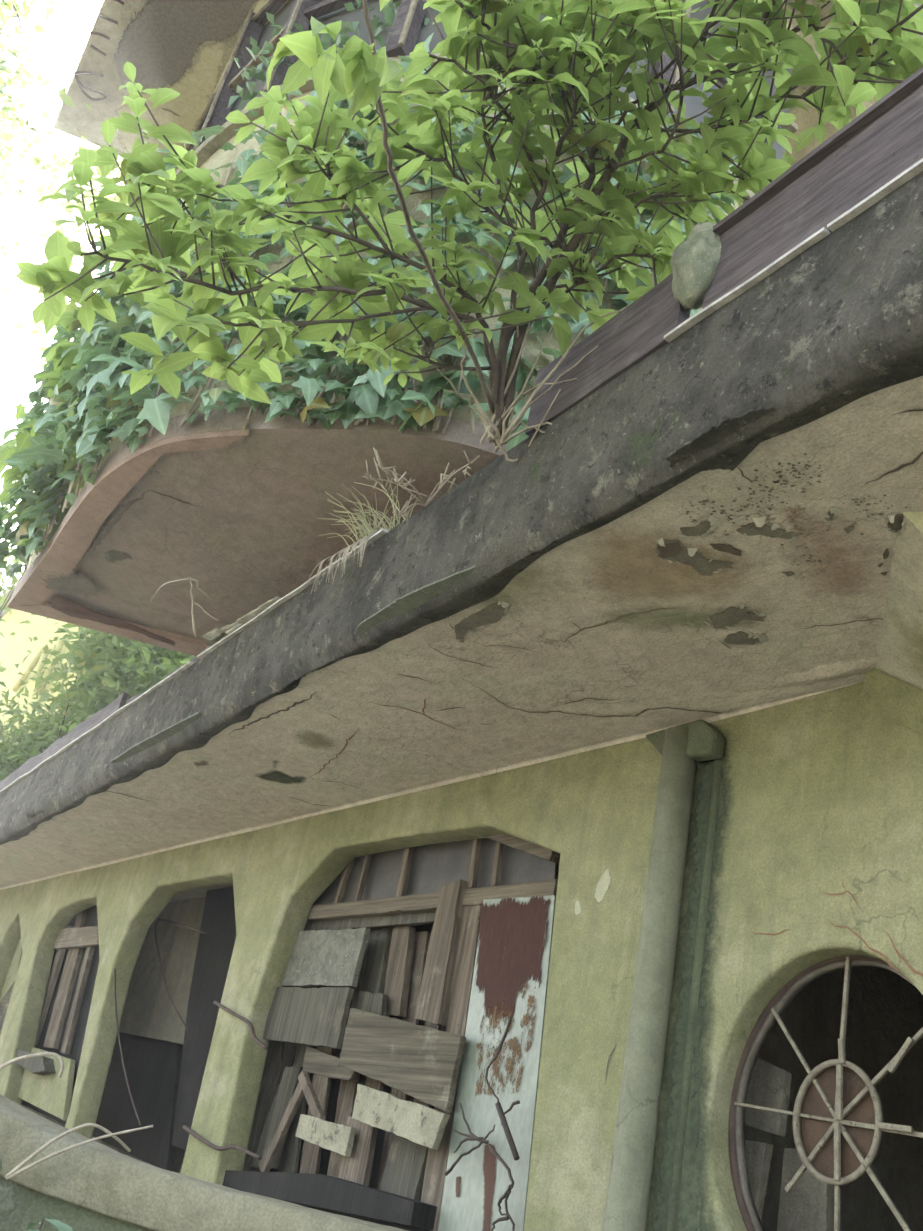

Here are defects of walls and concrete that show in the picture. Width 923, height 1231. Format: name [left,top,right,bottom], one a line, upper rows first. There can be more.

spalling [74,0,148,101]
flaking render [116,41,227,156]
crack [864,452,923,485]
spalling [449,601,510,642]
spalling [704,604,769,649]
crack [227,607,722,806]
crack [820,882,923,979]
rust [474,896,550,1096]
rust [482,1144,496,1231]